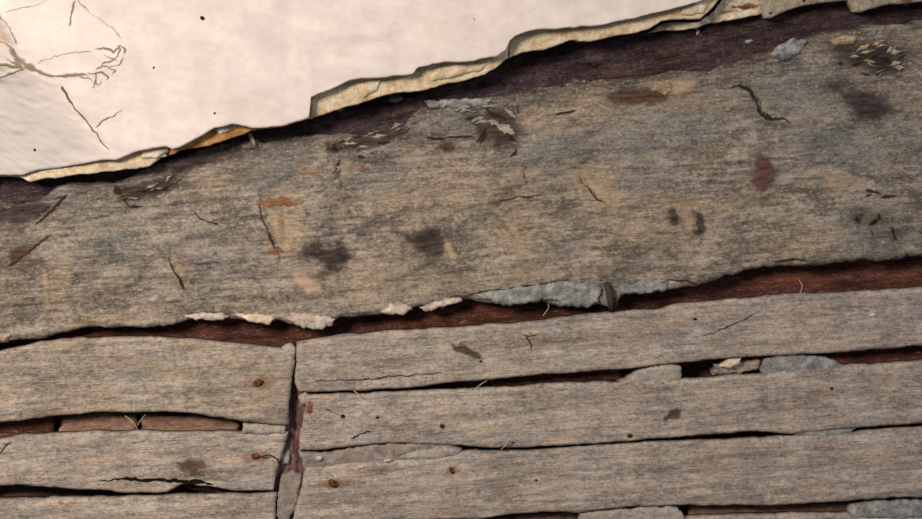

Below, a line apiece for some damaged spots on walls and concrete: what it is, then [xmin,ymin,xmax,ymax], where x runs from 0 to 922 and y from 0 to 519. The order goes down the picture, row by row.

crack [656,0,722,26]
crack [0,1,126,150]
flaking render [0,0,718,182]
corrosion [257,197,302,254]
crack [99,477,222,493]